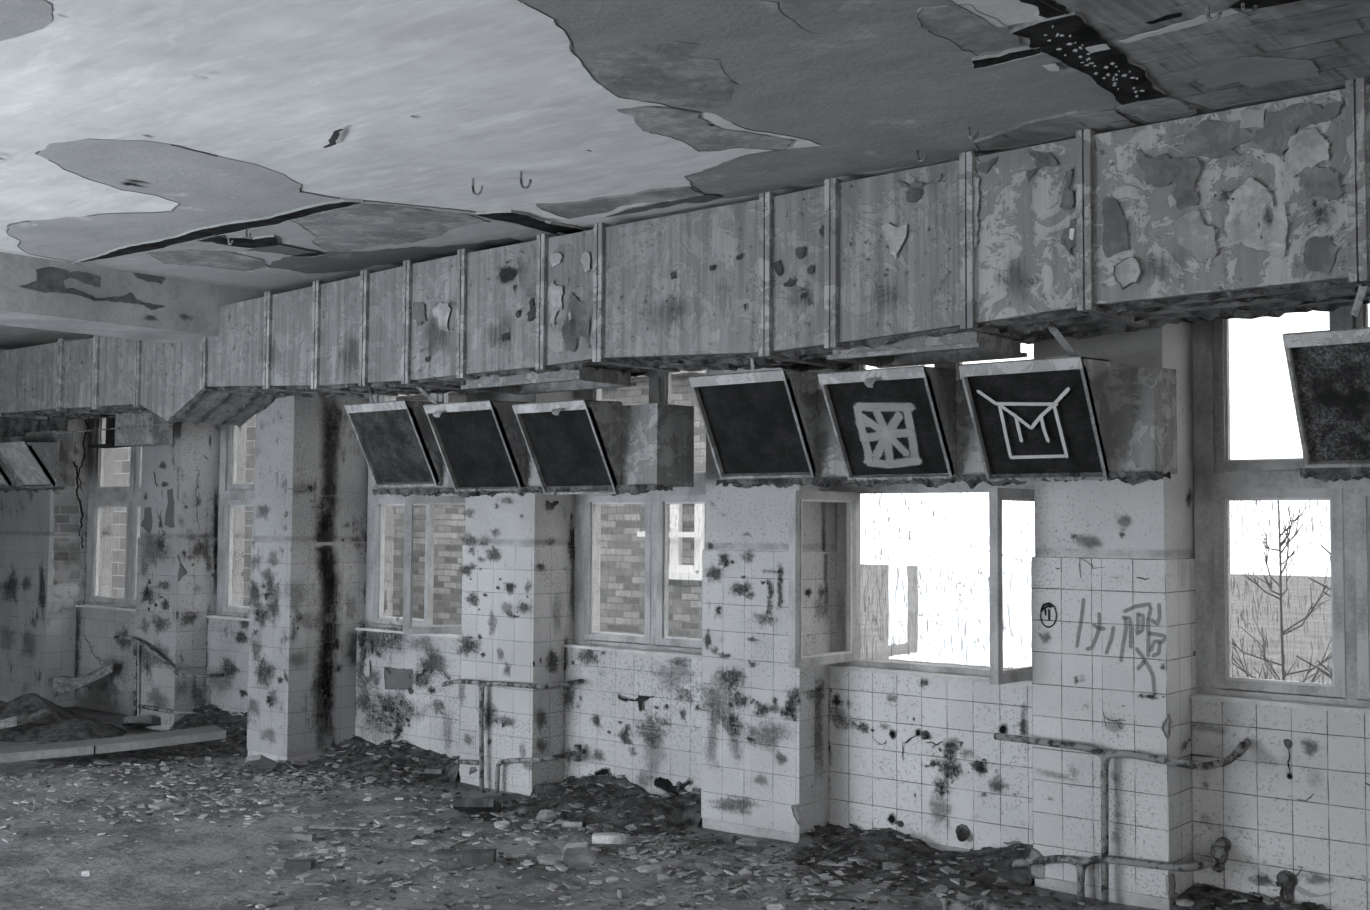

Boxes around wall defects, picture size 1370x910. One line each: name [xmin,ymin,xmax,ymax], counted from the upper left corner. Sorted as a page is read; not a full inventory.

crack [762,0,825,34]
peeling [1240,109,1264,128]
peeling [1285,127,1329,175]
peeling [1025,149,1077,258]
peeling [1171,178,1288,261]
peeling [19,267,166,310]
peeling [1113,257,1142,290]
leakage [236,582,302,643]
leakage [311,401,510,742]
mould [696,544,783,641]
leakage [240,657,282,706]
leakage [705,634,874,761]